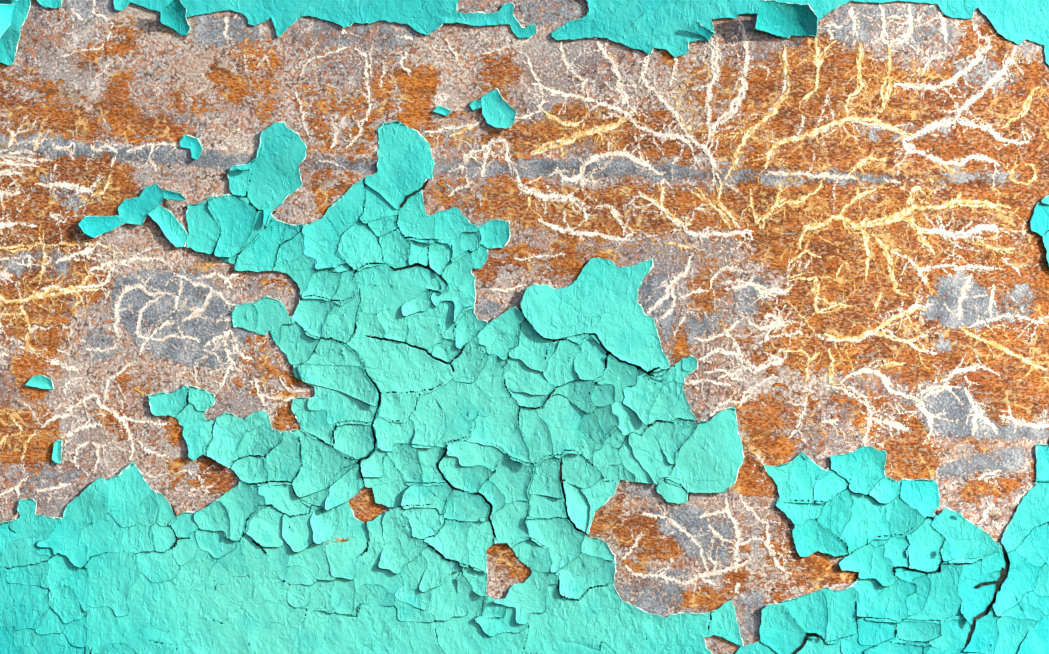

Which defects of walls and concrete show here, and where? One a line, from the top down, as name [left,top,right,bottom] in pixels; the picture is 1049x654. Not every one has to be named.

corrosion [0,29,284,148]
peeling [1009,40,1049,126]
damp [0,132,257,217]
corrosion [0,150,140,477]
corrosion [150,416,237,500]
crack [231,178,494,554]
corrosion [289,19,1049,613]
damp [920,270,1034,353]
damp [920,371,1049,481]
peeling [1032,398,1049,430]
crack [360,436,609,616]
crack [786,511,1049,654]